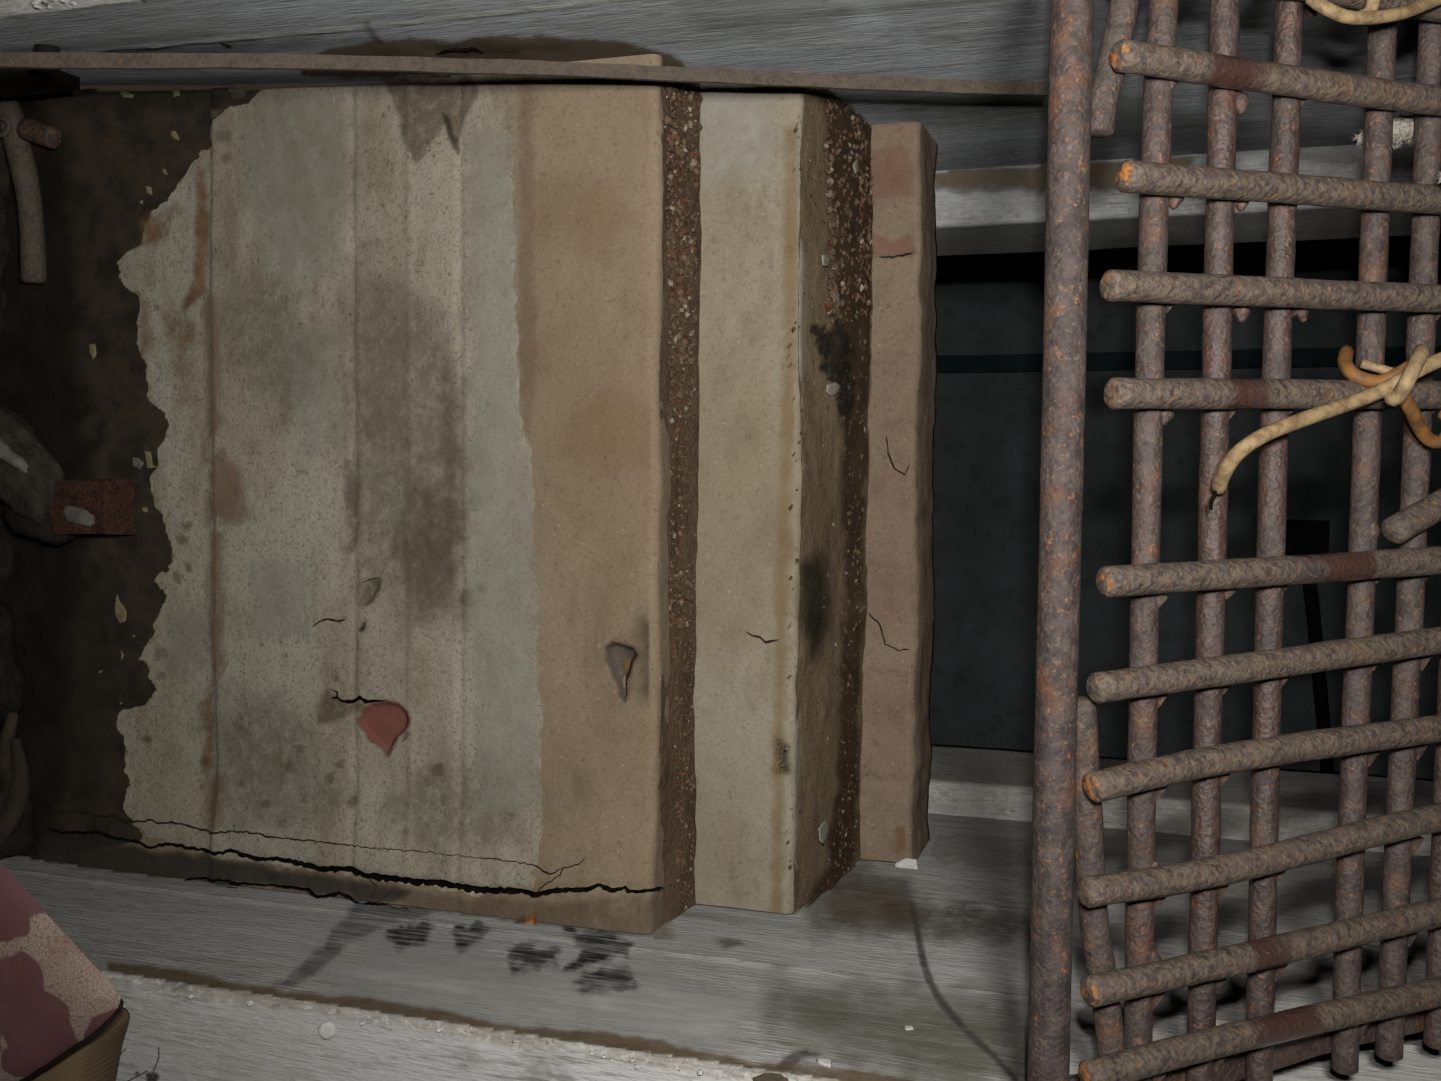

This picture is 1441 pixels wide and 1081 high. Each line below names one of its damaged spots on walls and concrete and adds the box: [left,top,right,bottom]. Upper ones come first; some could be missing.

damp [445,116,459,151]
spalling [606,642,638,701]
spalling [319,689,411,756]
crack [48,809,663,911]